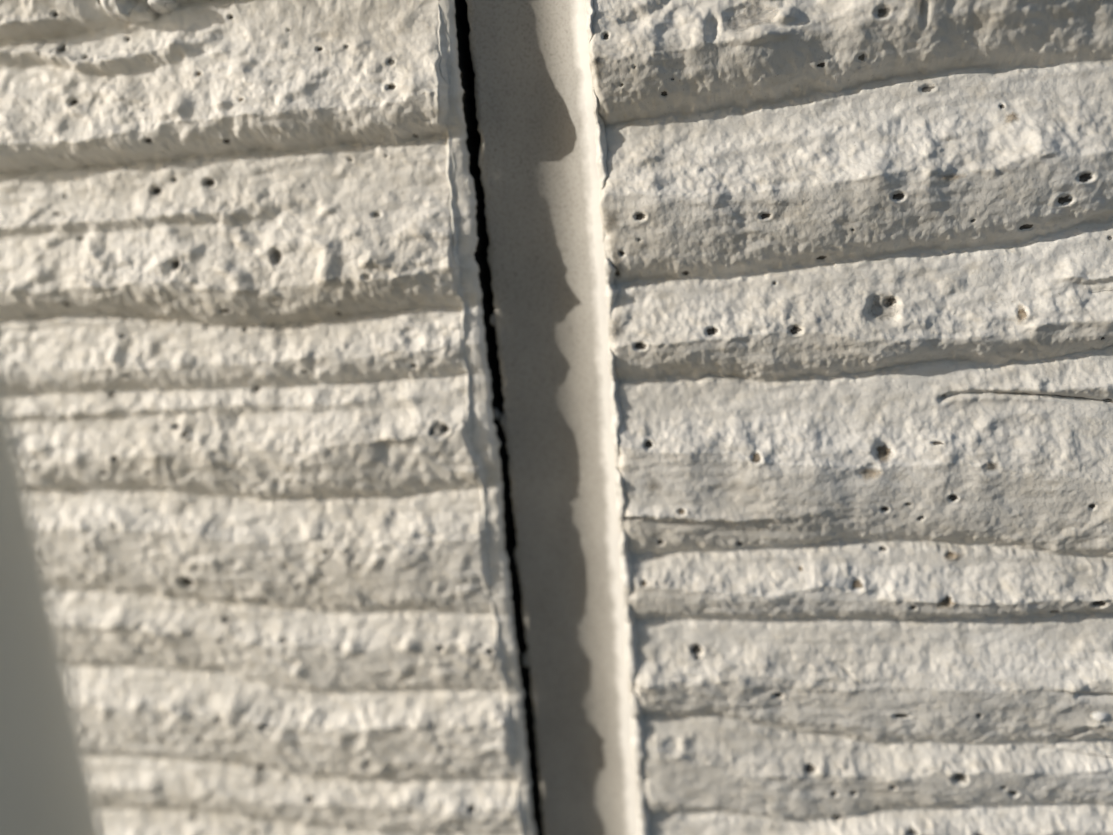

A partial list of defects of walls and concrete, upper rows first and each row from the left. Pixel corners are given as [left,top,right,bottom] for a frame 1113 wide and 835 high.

crack [454,0,544,835]
crack [940,392,1113,403]